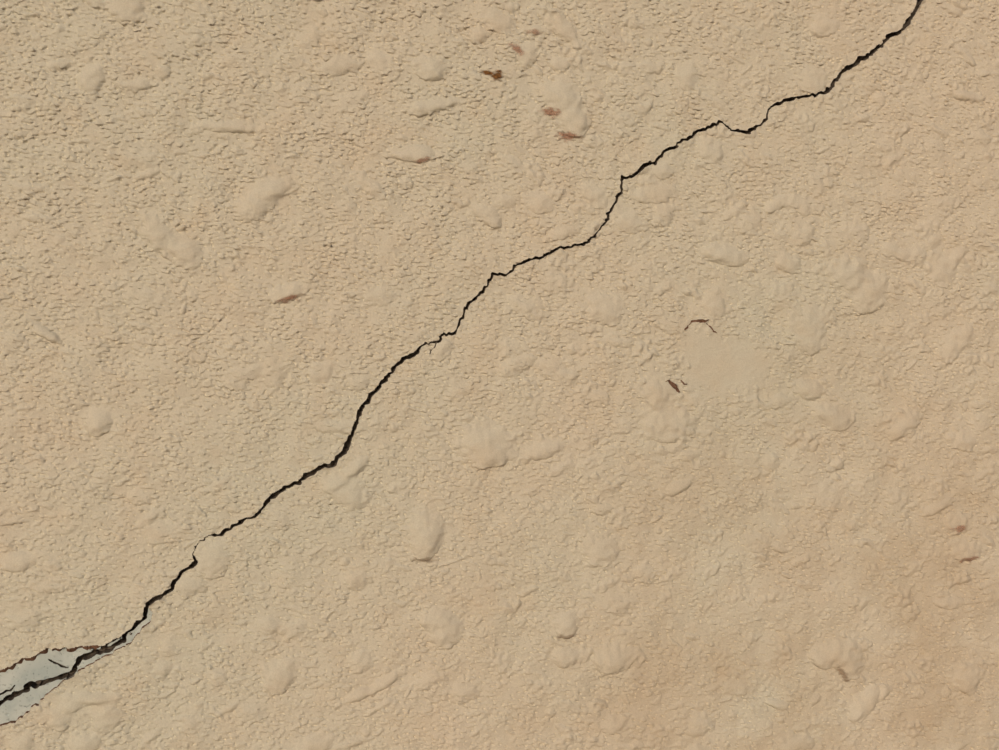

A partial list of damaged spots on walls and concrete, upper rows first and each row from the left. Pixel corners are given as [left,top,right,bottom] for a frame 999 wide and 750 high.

crack [437,0,923,343]
peeling [0,605,152,726]
crack [0,341,438,706]